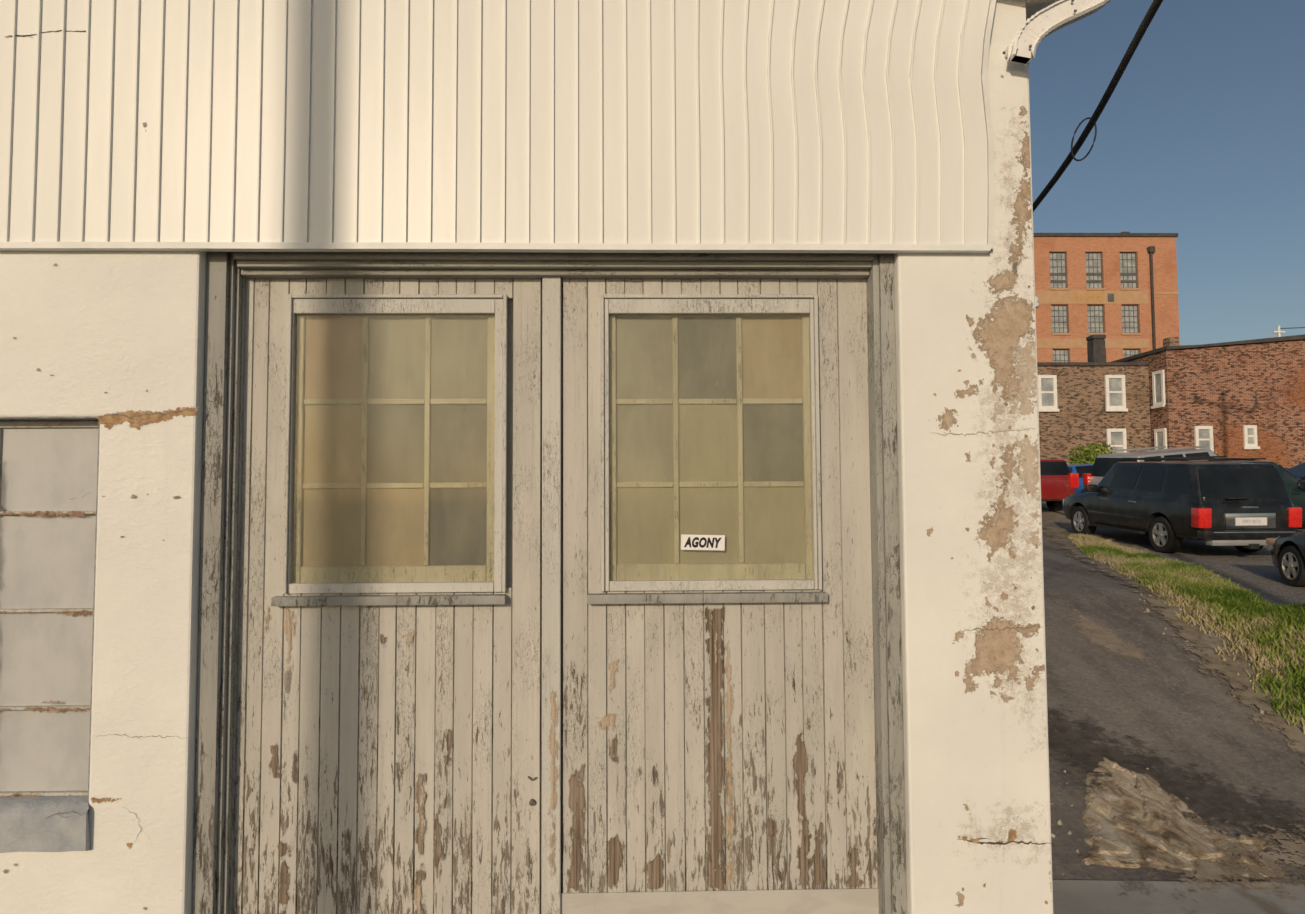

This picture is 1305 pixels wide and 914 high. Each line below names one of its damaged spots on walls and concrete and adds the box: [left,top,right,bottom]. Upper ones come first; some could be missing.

crack [5,29,86,37]
spalling [934,106,1041,578]
spalling [97,406,199,430]
rust [1,509,94,517]
peeling [952,582,1045,702]
rust [0,700,90,713]
spalling [958,829,1018,846]
crack [957,837,1051,845]